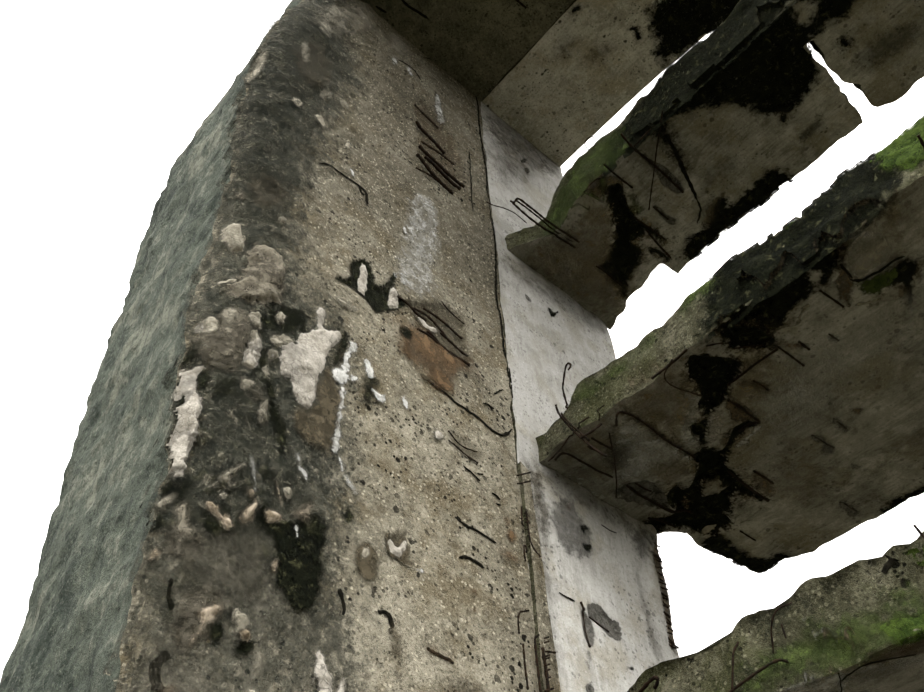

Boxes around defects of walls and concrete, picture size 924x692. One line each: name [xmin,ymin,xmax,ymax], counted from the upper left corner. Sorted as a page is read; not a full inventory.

leakage [487,0,857,313]
crack [667,136,702,224]
leakage [697,144,903,343]
leakage [103,0,386,692]
spalling [335,259,471,367]
peeling [153,307,341,478]
peeling [149,497,199,561]
peeling [203,463,292,531]
leakage [701,534,791,573]
crack [881,554,899,574]
leakage [881,487,924,515]
crack [838,654,916,692]